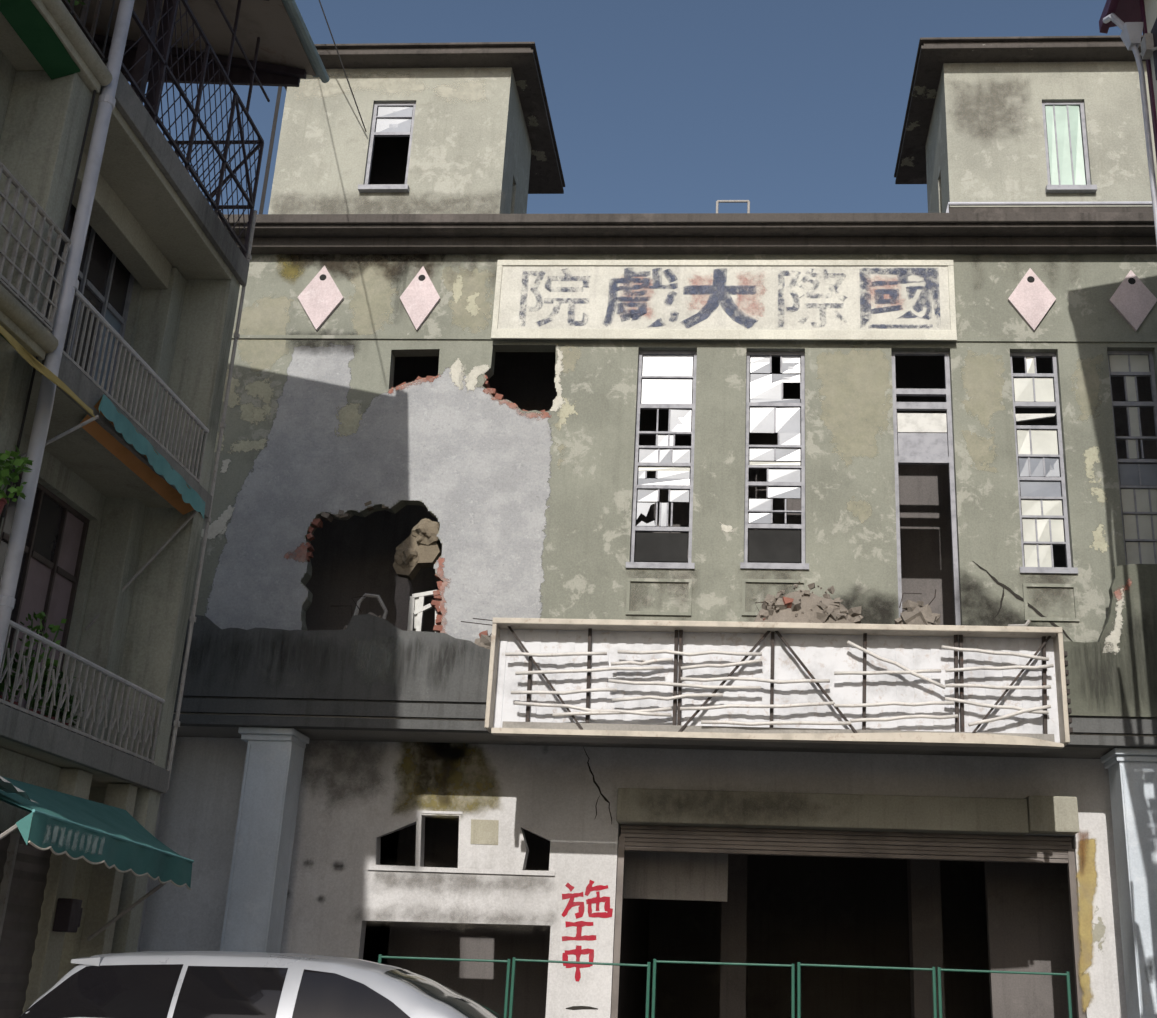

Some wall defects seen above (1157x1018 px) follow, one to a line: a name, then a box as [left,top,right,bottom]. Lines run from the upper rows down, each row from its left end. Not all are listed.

spalling [201,260,581,643]
peeling [1084,446,1108,503]
peeling [1089,524,1110,553]
crack [973,561,1072,641]
spalling [1103,578,1132,655]
crack [583,747,612,824]